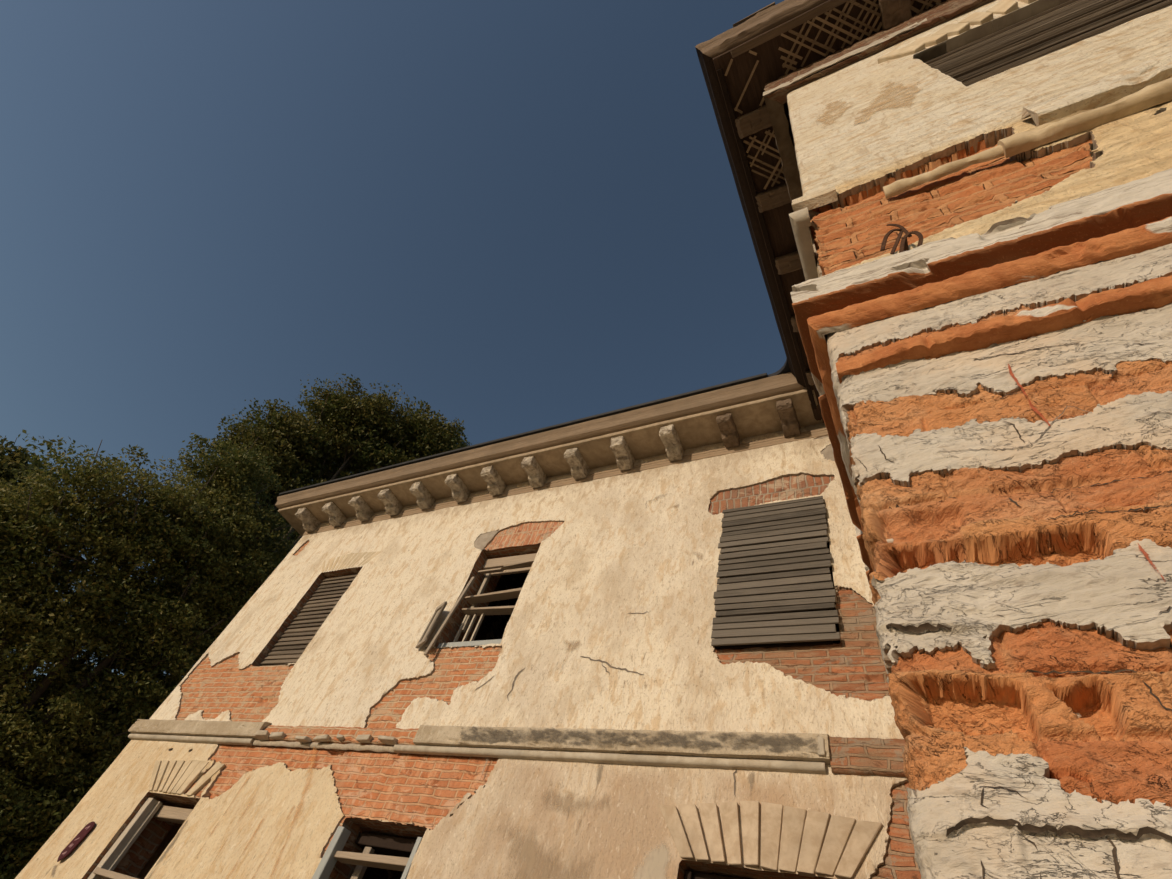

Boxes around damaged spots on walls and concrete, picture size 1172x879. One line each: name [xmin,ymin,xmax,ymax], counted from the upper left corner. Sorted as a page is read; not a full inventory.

flaking render [808,126,1104,276]
flaking render [837,272,1172,362]
flaking render [474,520,565,550]
crack [580,656,644,675]
flaking render [708,358,1172,879]
flaking render [175,645,503,858]